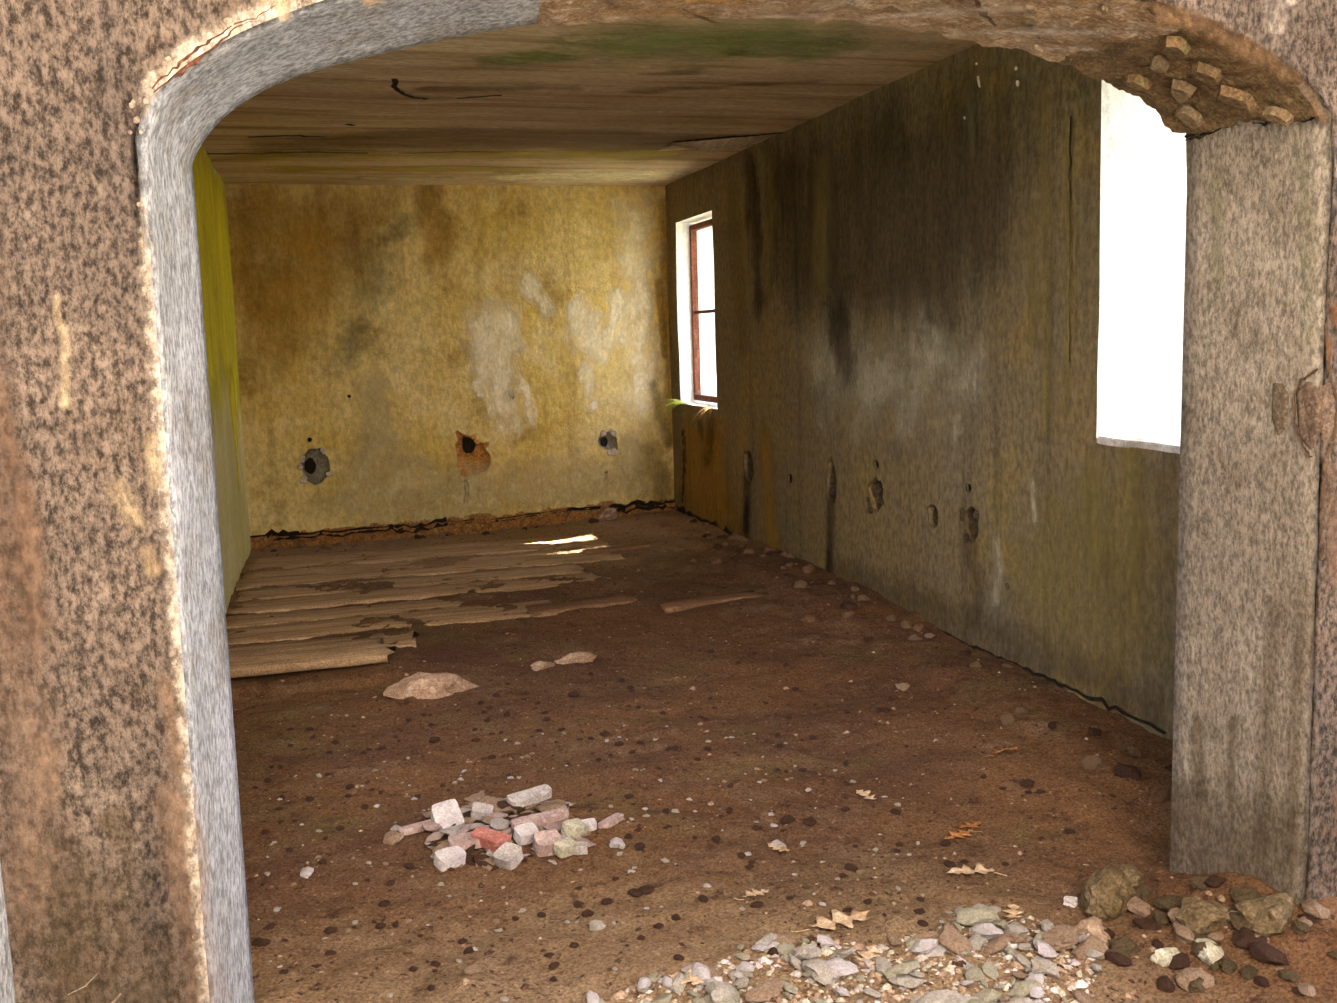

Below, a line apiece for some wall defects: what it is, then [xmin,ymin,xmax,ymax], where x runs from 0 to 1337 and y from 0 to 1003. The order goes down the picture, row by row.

flaking render [127,0,323,135]
spalling [541,0,1329,134]
damp [746,82,1011,429]
spalling [456,434,490,476]
crack [676,430,763,543]
spalling [1272,382,1336,450]
crack [939,629,1166,734]